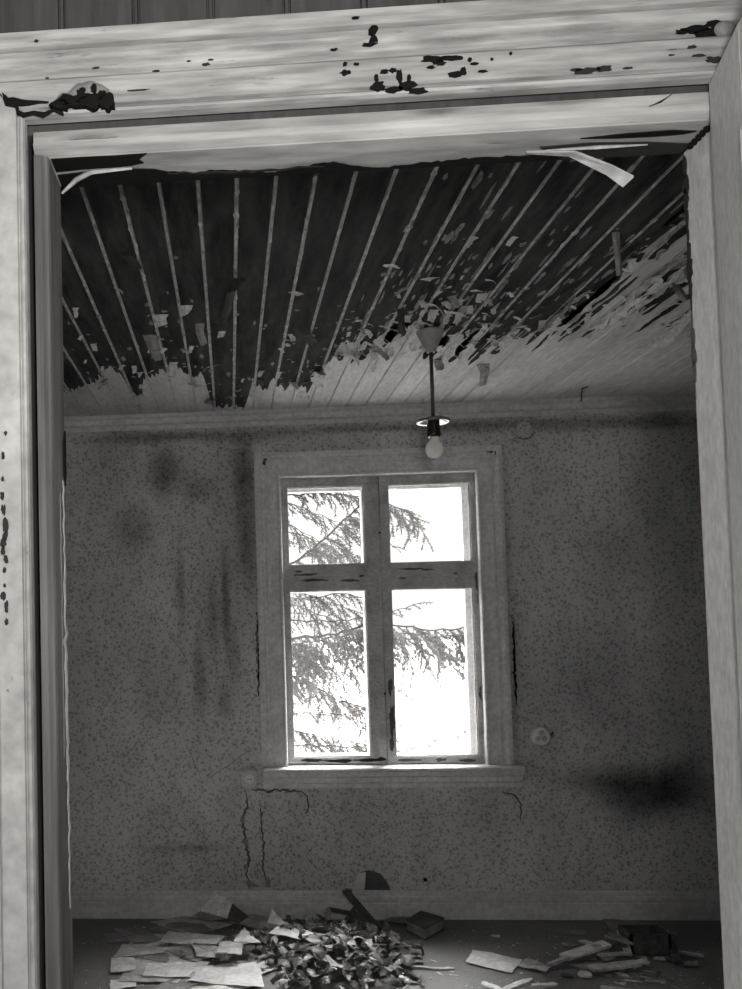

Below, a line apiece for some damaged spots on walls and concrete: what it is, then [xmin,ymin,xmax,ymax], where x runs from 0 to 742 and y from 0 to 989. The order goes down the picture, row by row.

peeling [362,25,378,47]
peeling [687,45,722,63]
peeling [370,68,429,94]
peeling [570,65,633,74]
peeling [51,125,710,416]
peeling [0,476,9,625]